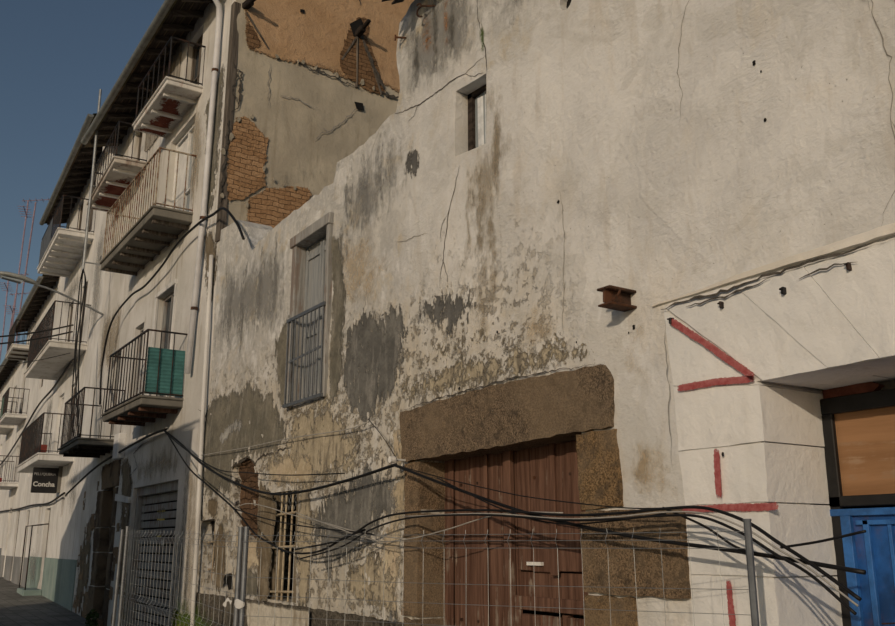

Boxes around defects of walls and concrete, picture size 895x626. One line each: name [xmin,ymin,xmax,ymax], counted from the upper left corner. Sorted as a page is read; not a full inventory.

crack [218,63,243,208]
spalling [203,59,312,302]
spalling [244,0,414,94]
crack [295,8,487,140]
crack [399,169,459,288]
crack [677,1,689,117]
crack [862,0,895,138]
crack [661,191,895,436]
spalling [203,234,587,620]
peeling [72,507,92,616]
peeling [118,458,133,626]